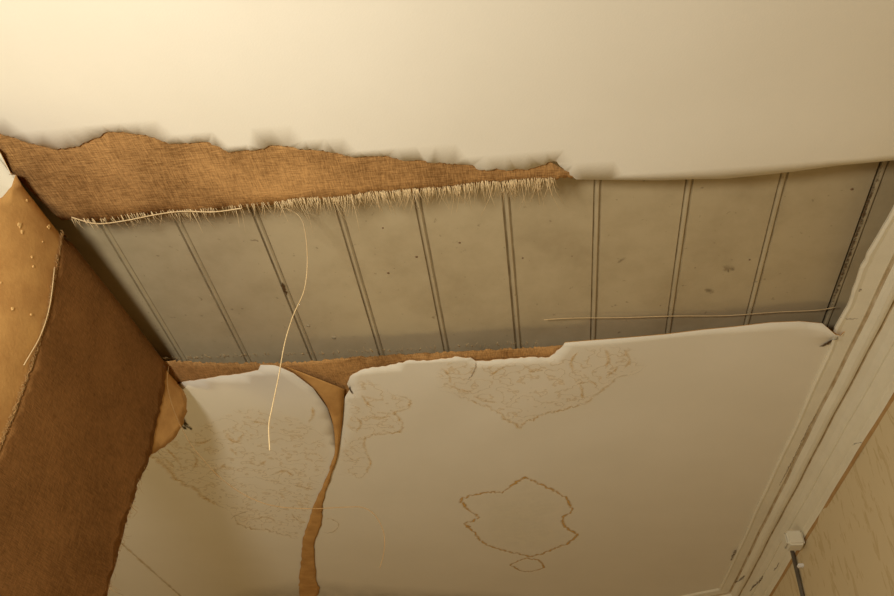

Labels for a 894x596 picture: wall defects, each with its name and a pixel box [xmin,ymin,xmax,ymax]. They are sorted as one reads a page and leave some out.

peeling [0,152,187,596]
peeling [281,364,344,596]
damp [460,477,578,572]